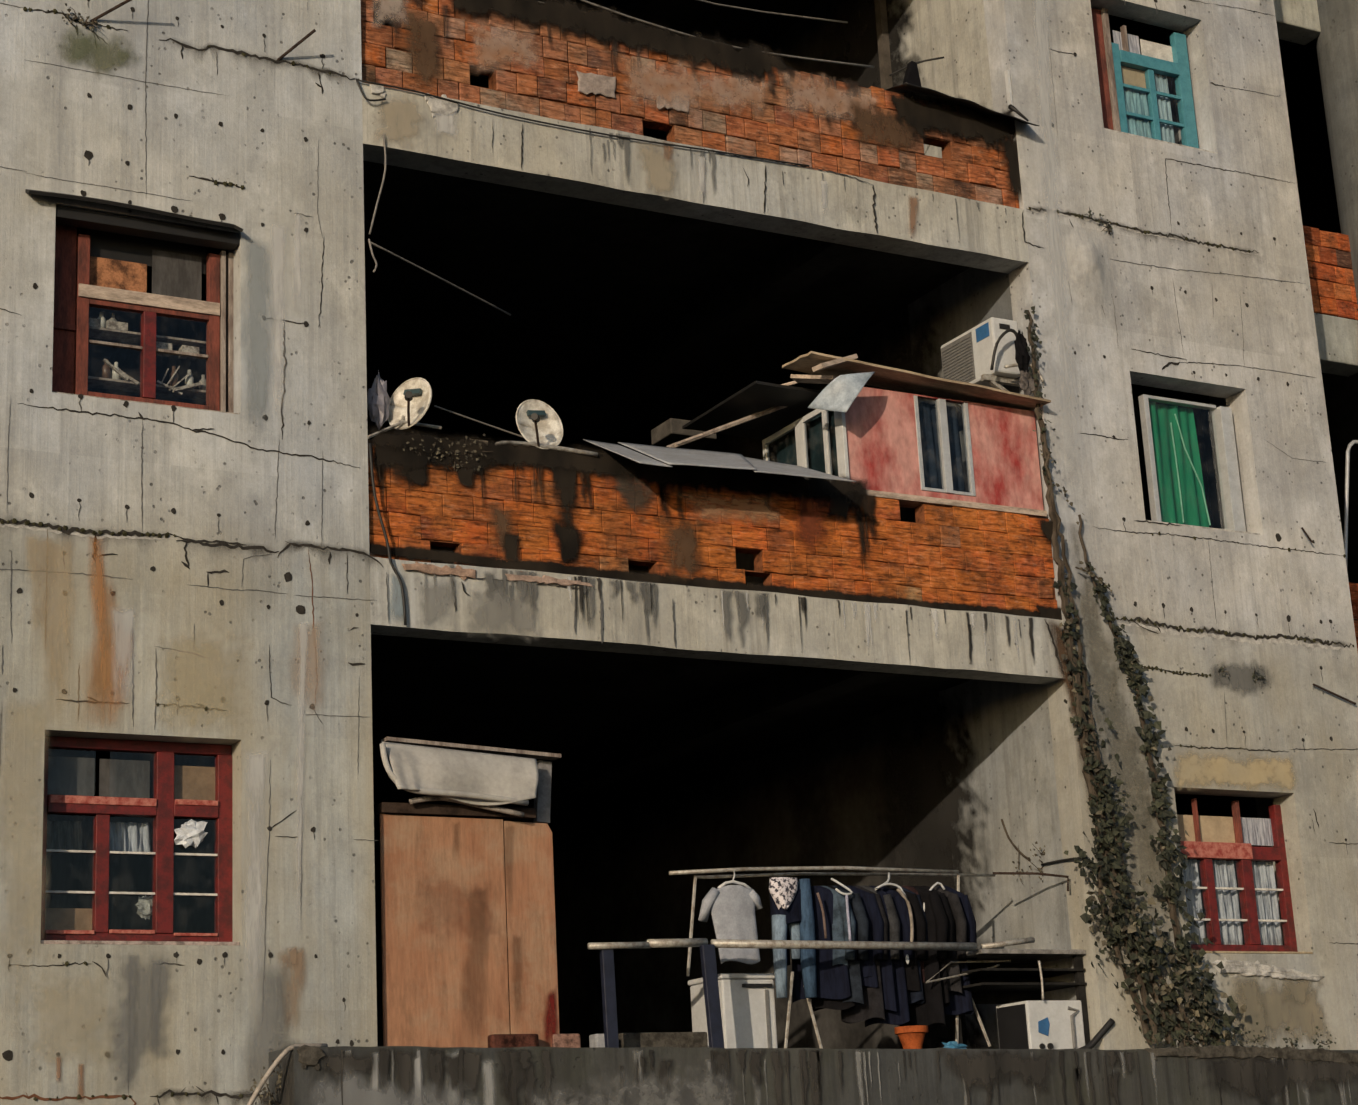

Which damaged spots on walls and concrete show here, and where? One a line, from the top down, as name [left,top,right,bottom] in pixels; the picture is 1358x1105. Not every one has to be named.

crack [23,7,127,44]
crack [161,38,360,94]
spalling [576,71,616,98]
leakage [604,39,877,125]
crack [1022,158,1306,284]
leakage [552,519,658,637]
corrosion [92,541,131,699]
crack [0,518,383,724]
leakage [721,591,776,644]
leakage [798,597,807,644]
leakage [966,604,1062,662]
crack [0,1086,263,1105]